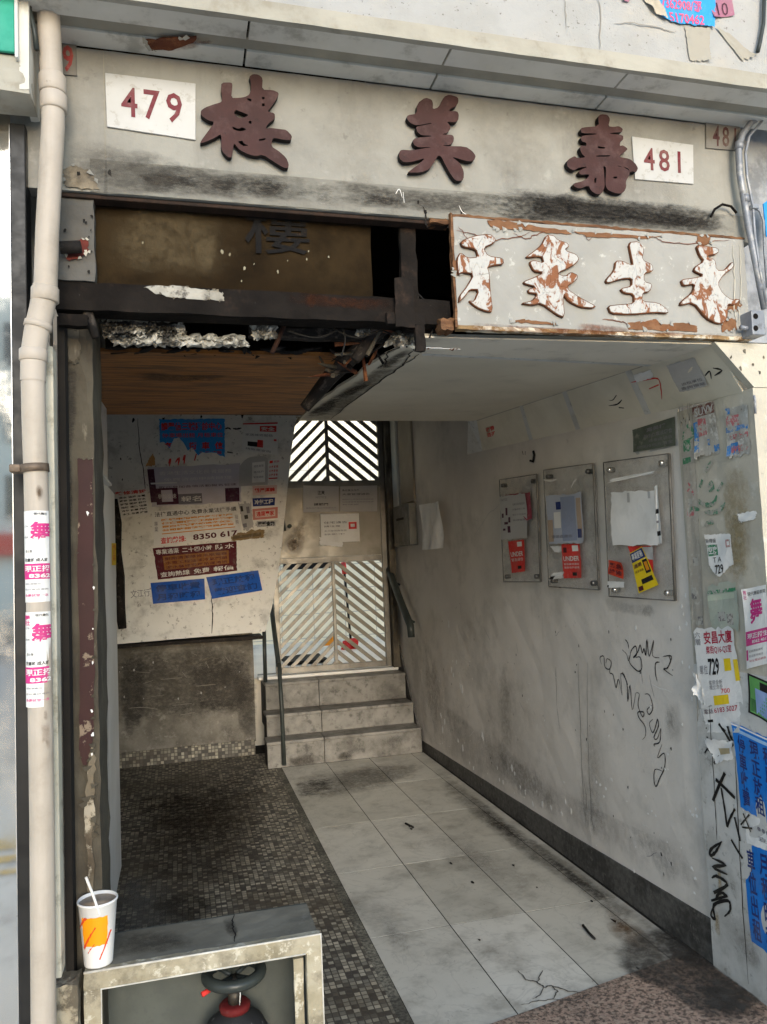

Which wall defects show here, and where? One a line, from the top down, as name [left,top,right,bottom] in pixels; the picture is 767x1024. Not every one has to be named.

peeling [142,35,197,52]
spalling [62,163,111,190]
leakage [535,198,705,226]
spalling [99,319,279,349]
crack [518,970,586,1005]